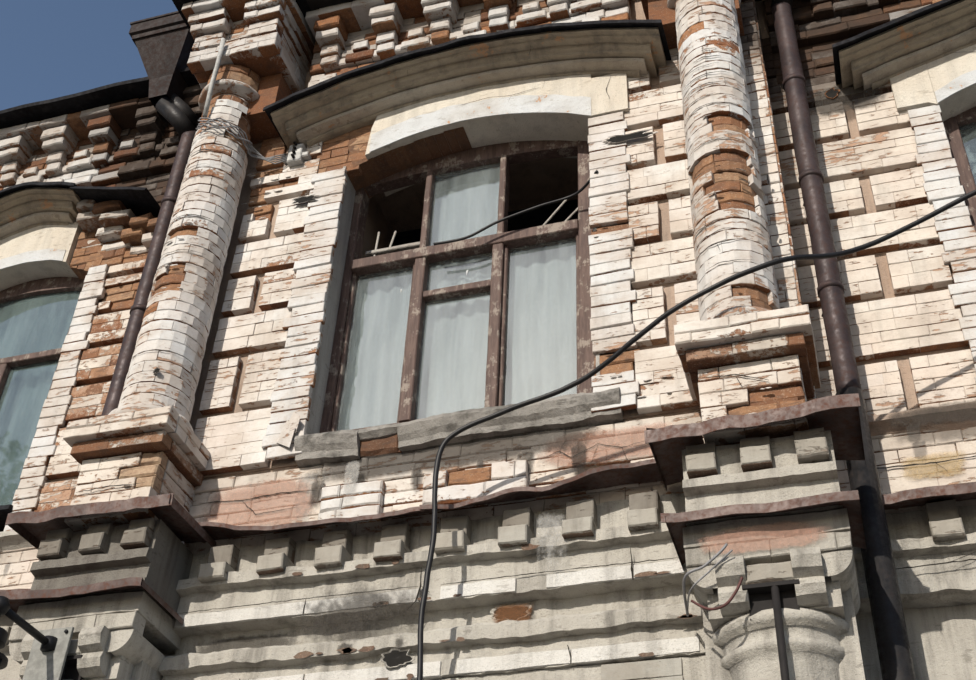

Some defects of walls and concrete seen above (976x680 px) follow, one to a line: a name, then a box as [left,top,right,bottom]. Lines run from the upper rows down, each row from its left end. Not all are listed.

spalling [197,92,251,155]
spalling [701,114,758,147]
spalling [243,137,298,222]
spalling [687,148,765,212]
spalling [70,199,158,280]
spalling [102,282,139,312]
spalling [154,264,186,295]
spalling [732,286,777,310]